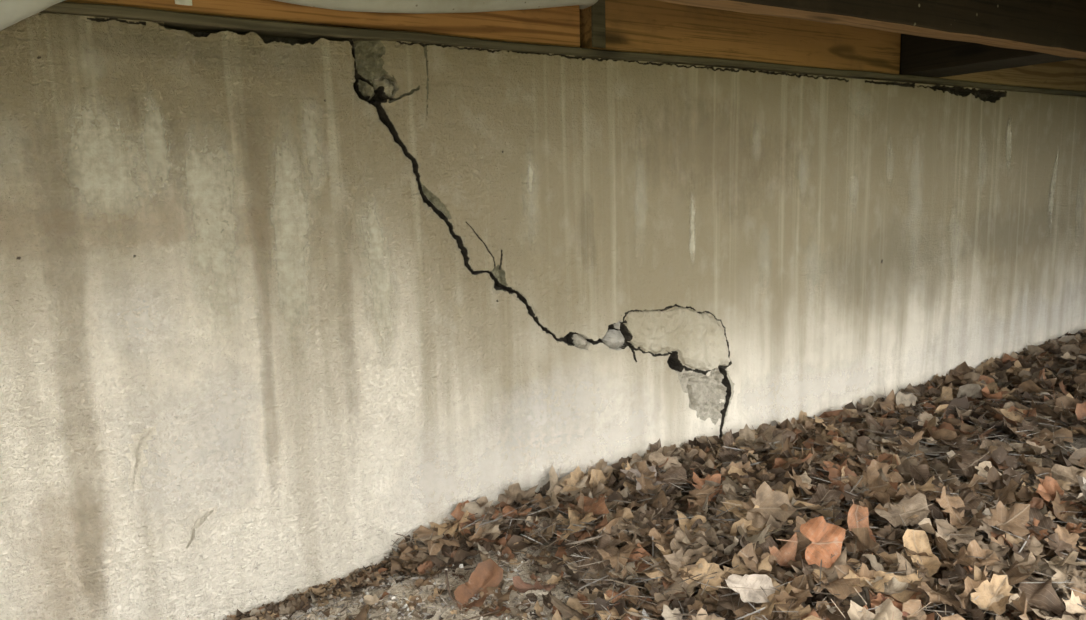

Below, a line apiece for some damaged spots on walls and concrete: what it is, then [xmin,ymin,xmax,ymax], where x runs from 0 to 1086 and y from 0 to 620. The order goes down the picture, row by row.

spalling [79,15,1009,106]
water stain [68,115,133,214]
water stain [145,113,169,176]
water stain [187,149,235,302]
water stain [271,150,307,318]
crack [342,39,603,351]
spalling [672,368,727,431]
crack [717,365,741,438]